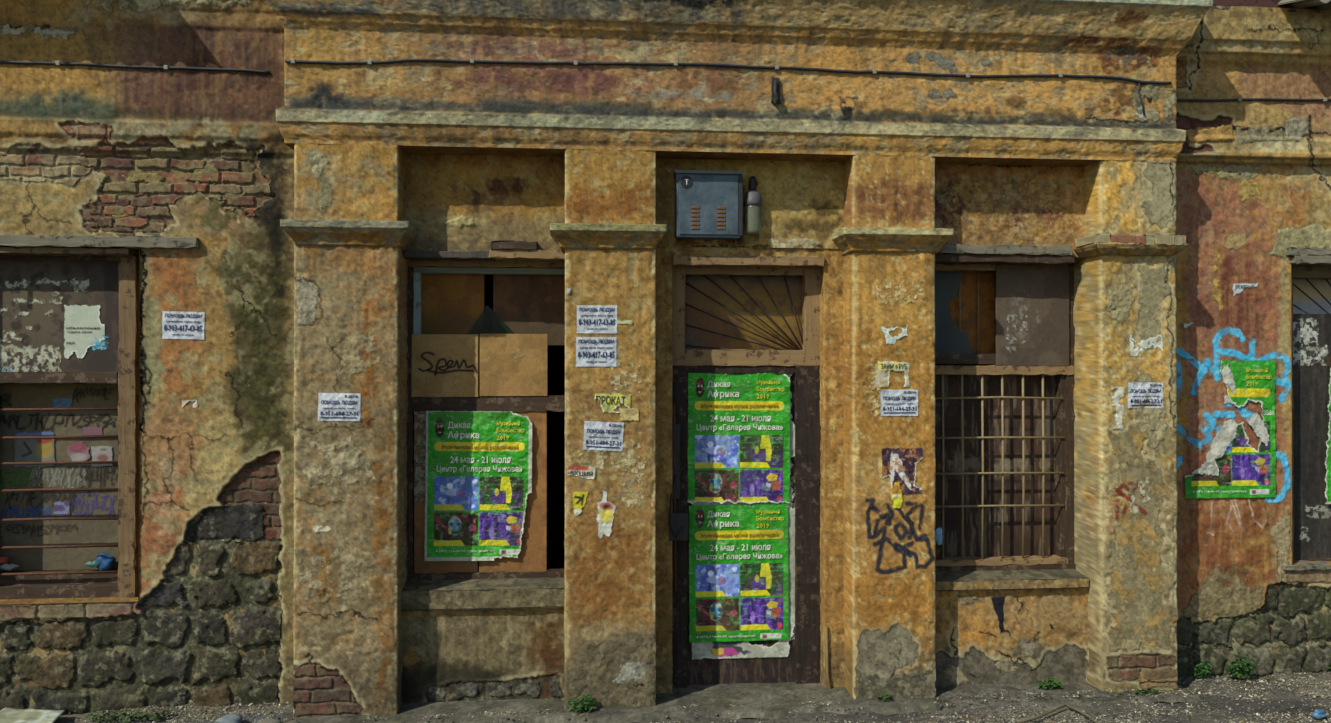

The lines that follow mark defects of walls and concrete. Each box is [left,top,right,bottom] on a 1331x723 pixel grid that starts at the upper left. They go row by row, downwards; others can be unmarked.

crack [1183,20,1205,90]
spalling [0,119,274,237]
peeling [935,57,1331,248]
crack [1307,128,1331,189]
peeling [1105,264,1171,349]
peeling [1213,232,1248,311]
peeling [1269,223,1331,258]
peeling [1107,374,1331,689]
spalling [293,663,362,718]
peeling [854,623,1089,699]